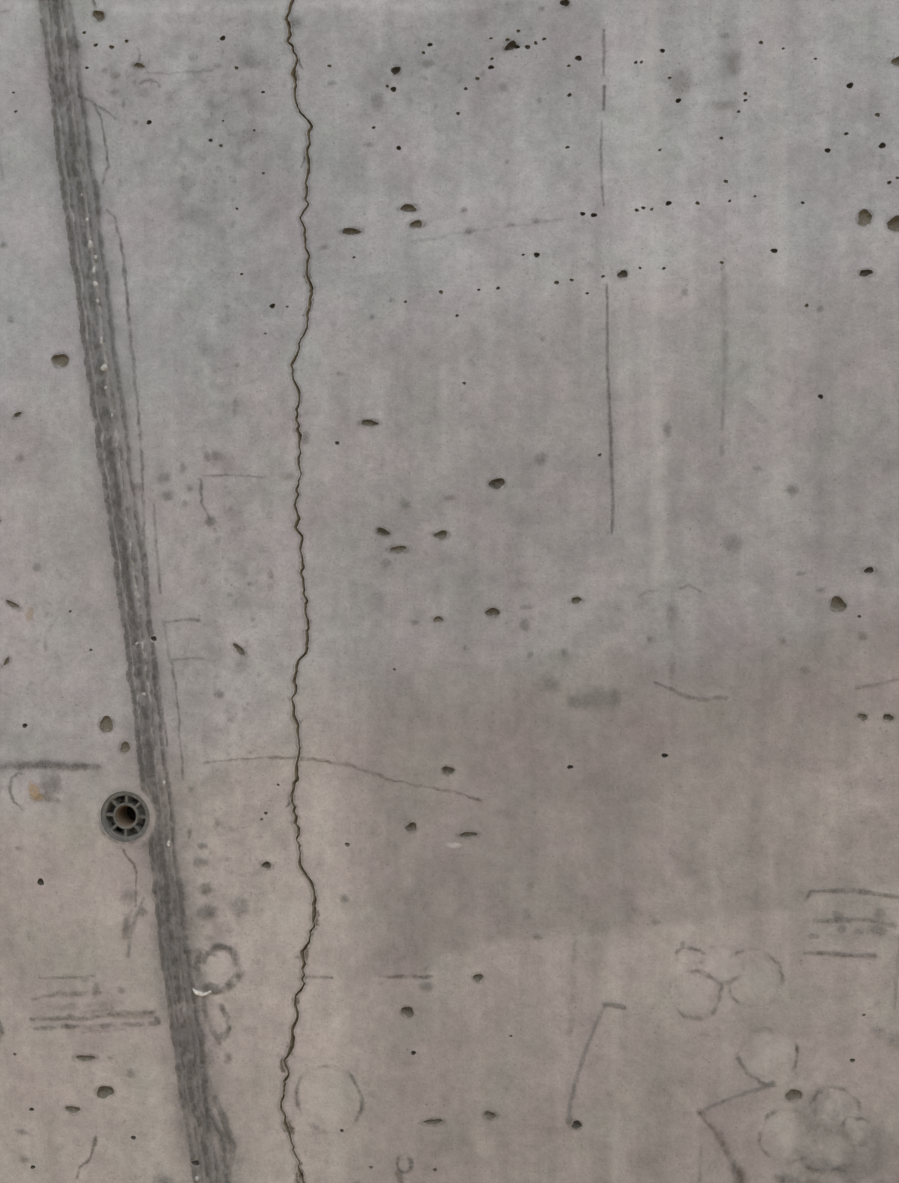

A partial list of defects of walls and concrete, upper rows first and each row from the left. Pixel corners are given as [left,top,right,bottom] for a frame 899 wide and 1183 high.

crack [280,0,330,1183]